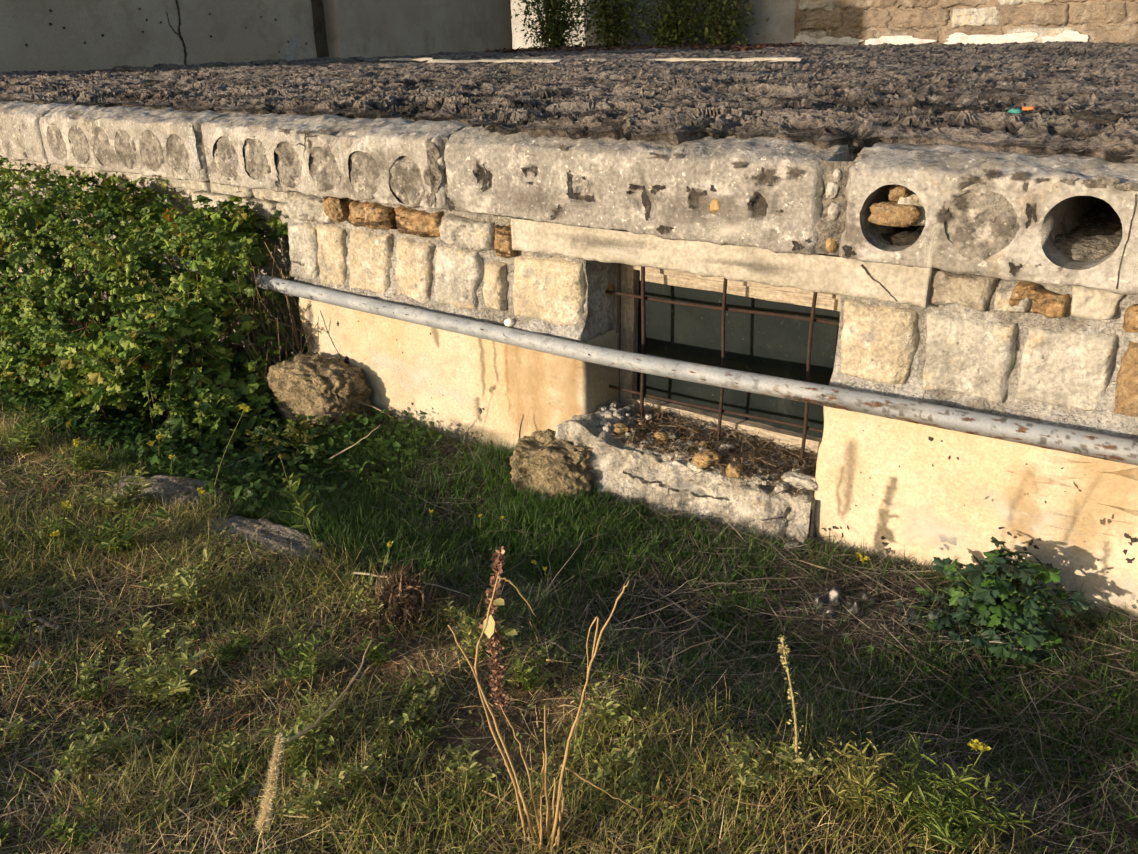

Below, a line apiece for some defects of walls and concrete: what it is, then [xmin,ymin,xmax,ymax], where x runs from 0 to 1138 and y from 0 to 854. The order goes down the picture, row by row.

spalling [473,161,492,192]
spalling [550,170,595,220]
spalling [626,184,666,221]
spalling [686,185,720,213]
spalling [747,167,783,216]
crack [1116,194,1137,289]
crack [861,264,897,302]
rust [864,400,950,430]
rust [962,418,1028,440]
rust [1084,436,1124,461]
crack [623,470,728,504]
crack [760,507,790,539]